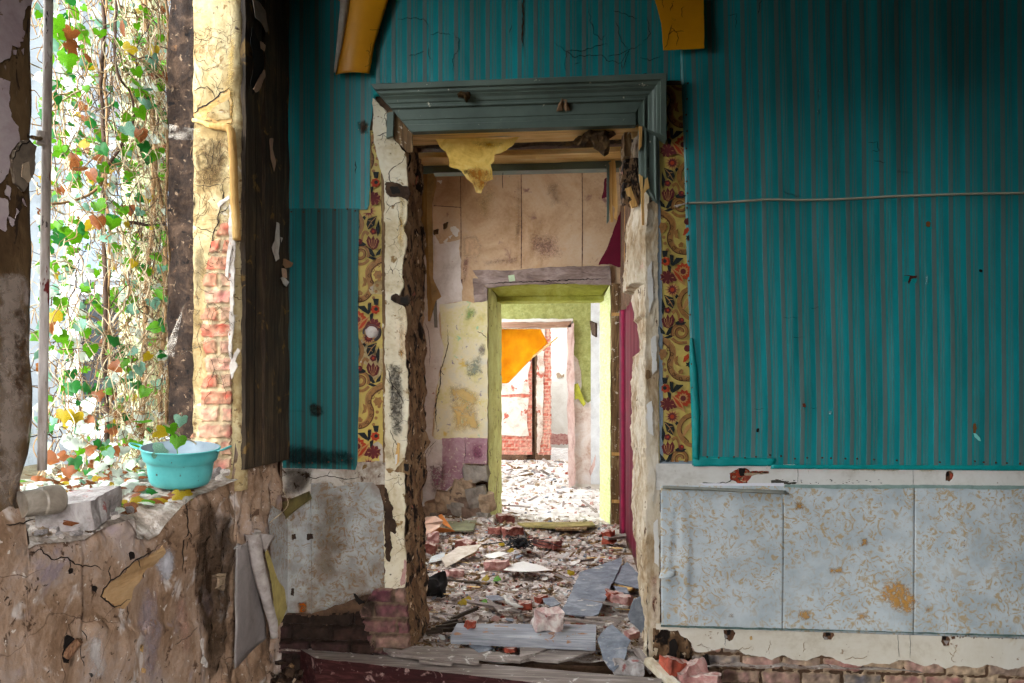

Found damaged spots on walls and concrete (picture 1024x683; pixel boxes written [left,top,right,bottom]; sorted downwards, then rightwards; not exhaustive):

peeling [0,0,32,62]
peeling [0,78,27,232]
flaking render [279,98,411,682]
flaking render [644,201,1024,683]
crack [29,502,192,618]